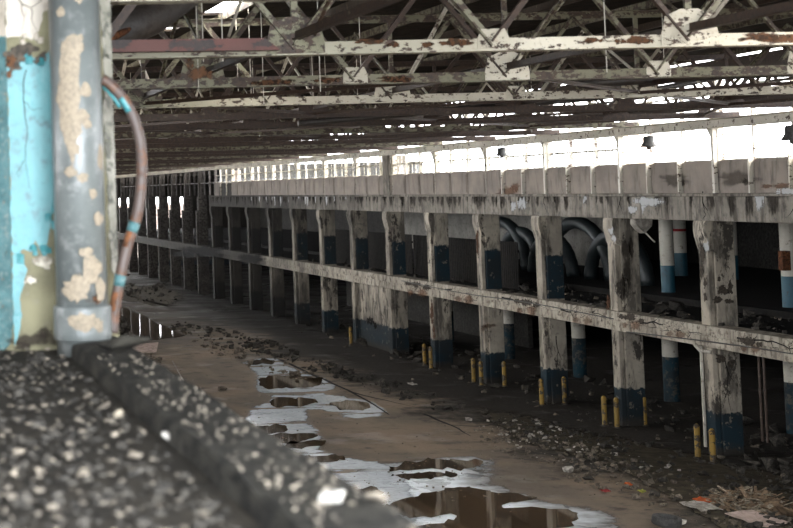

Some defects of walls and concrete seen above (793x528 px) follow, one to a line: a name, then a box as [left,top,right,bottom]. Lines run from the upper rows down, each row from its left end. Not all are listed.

rust [355,38,400,48]
rust [421,38,474,48]
rust [738,32,793,43]
peeling [0,0,132,350]
spalling [630,219,655,242]
spalling [699,238,734,304]